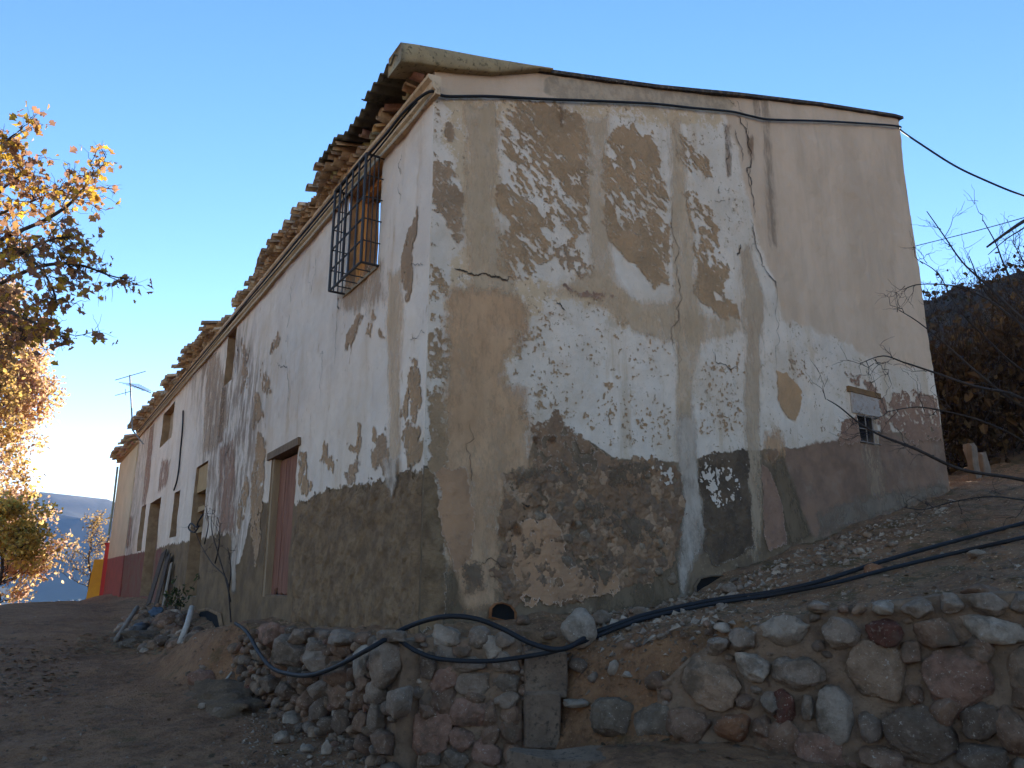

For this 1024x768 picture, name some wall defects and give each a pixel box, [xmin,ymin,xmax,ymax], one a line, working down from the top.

peeling [400,209,418,302]
peeling [431,152,465,243]
crack [457,269,510,281]
peeling [489,97,674,473]
peeling [681,187,742,321]
crack [717,97,780,365]
flaking render [290,264,454,634]
damp [560,119,811,612]
peeling [776,351,810,421]
peeling [845,371,943,446]
flaking render [488,513,620,621]
flaking render [693,448,787,592]